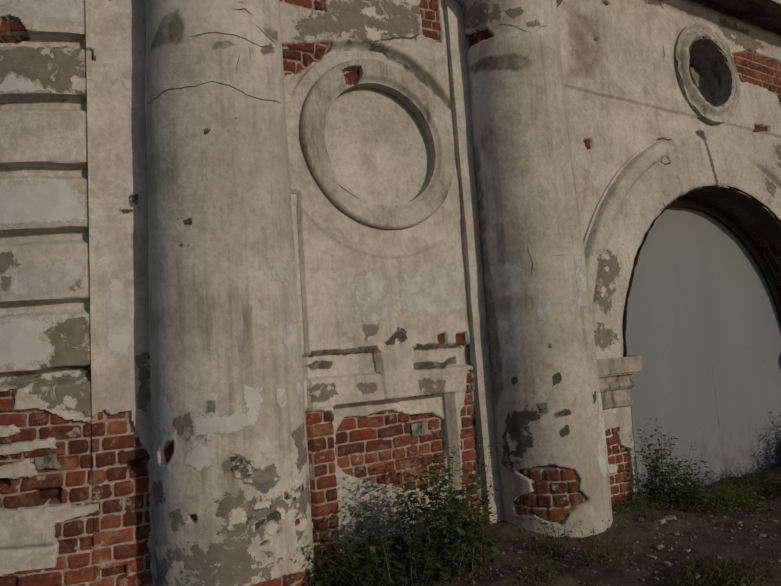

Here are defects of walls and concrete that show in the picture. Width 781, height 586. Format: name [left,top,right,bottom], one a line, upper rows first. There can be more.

peeling [0,20,94,102]
crack [149,1,281,103]
peeling [279,0,441,76]
flaking render [718,16,781,107]
peeling [593,247,622,313]
peeling [594,322,618,352]
flaking render [0,314,446,586]
flaking render [454,370,479,520]
flaking render [501,405,587,524]
flaking render [605,427,633,503]